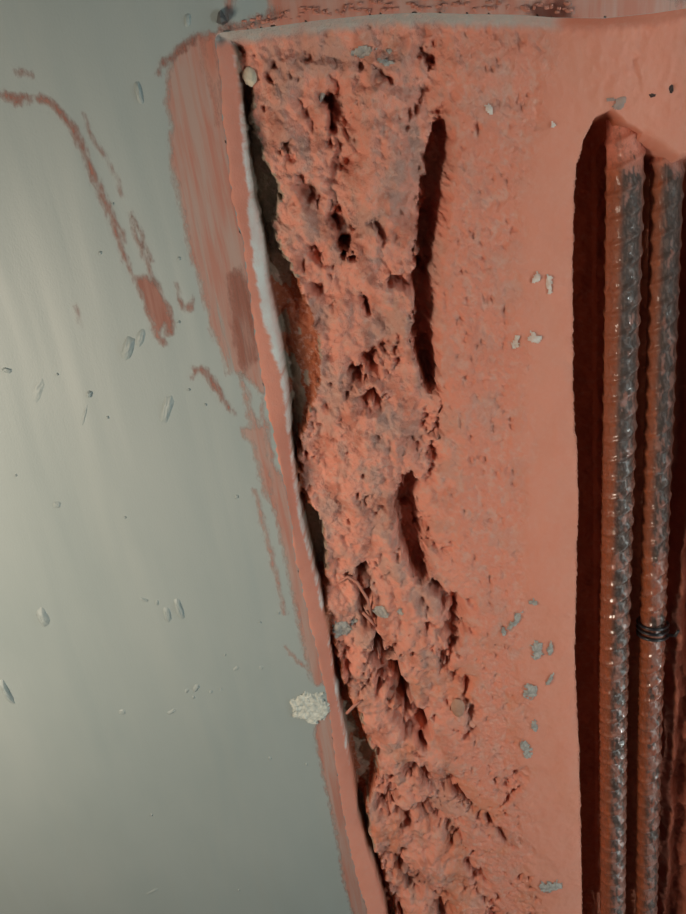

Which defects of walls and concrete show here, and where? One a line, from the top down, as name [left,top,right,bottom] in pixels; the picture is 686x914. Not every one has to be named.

spalling [215,8,686,914]